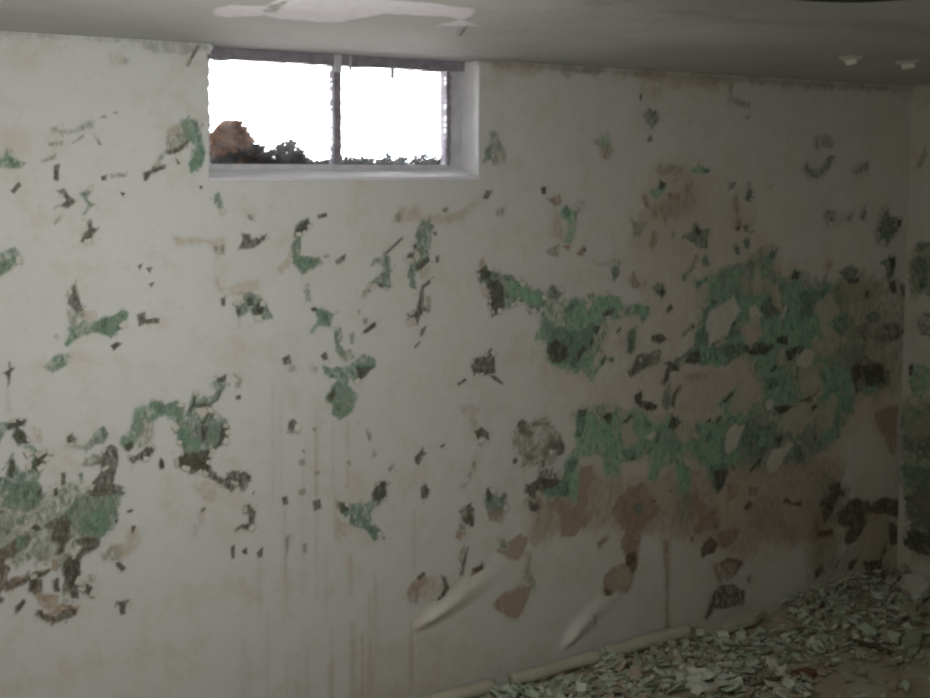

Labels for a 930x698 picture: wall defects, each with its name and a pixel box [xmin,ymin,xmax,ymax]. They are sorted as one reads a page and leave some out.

peeling [0,239,24,278]
peeling [37,279,161,375]
peeling [52,114,207,246]
peeling [204,273,274,329]
peeling [237,213,271,251]
peeling [275,211,440,459]
peeling [456,346,504,386]
water stain [515,143,802,475]
peeling [474,151,930,622]
peeling [0,372,264,627]
peeling [343,462,395,543]
peeling [406,486,509,606]